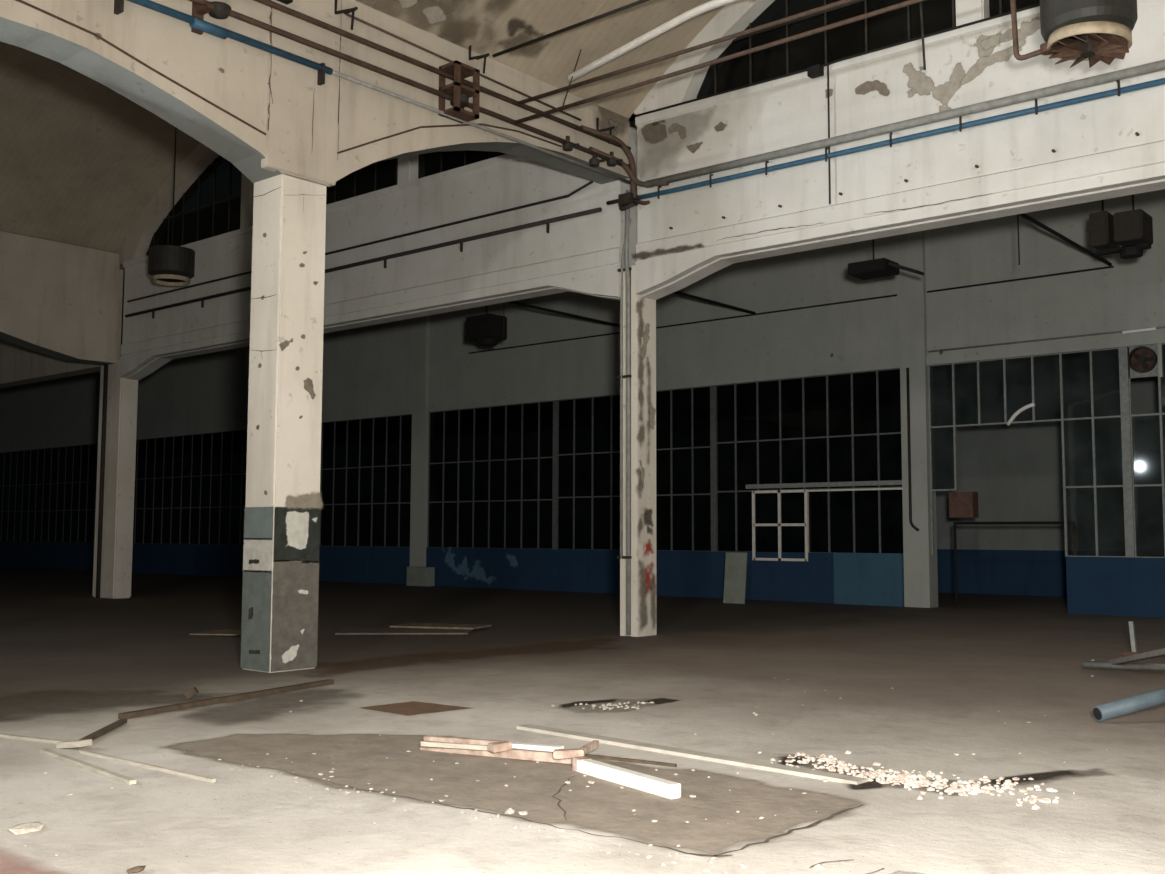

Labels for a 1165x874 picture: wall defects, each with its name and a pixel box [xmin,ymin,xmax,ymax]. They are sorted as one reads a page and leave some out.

leakage [368,0,477,44]
leakage [490,19,543,55]
crack [266,7,274,130]
spalling [855,80,890,96]
peeling [903,17,1040,112]
spalling [641,120,703,153]
peeling [286,511,317,550]